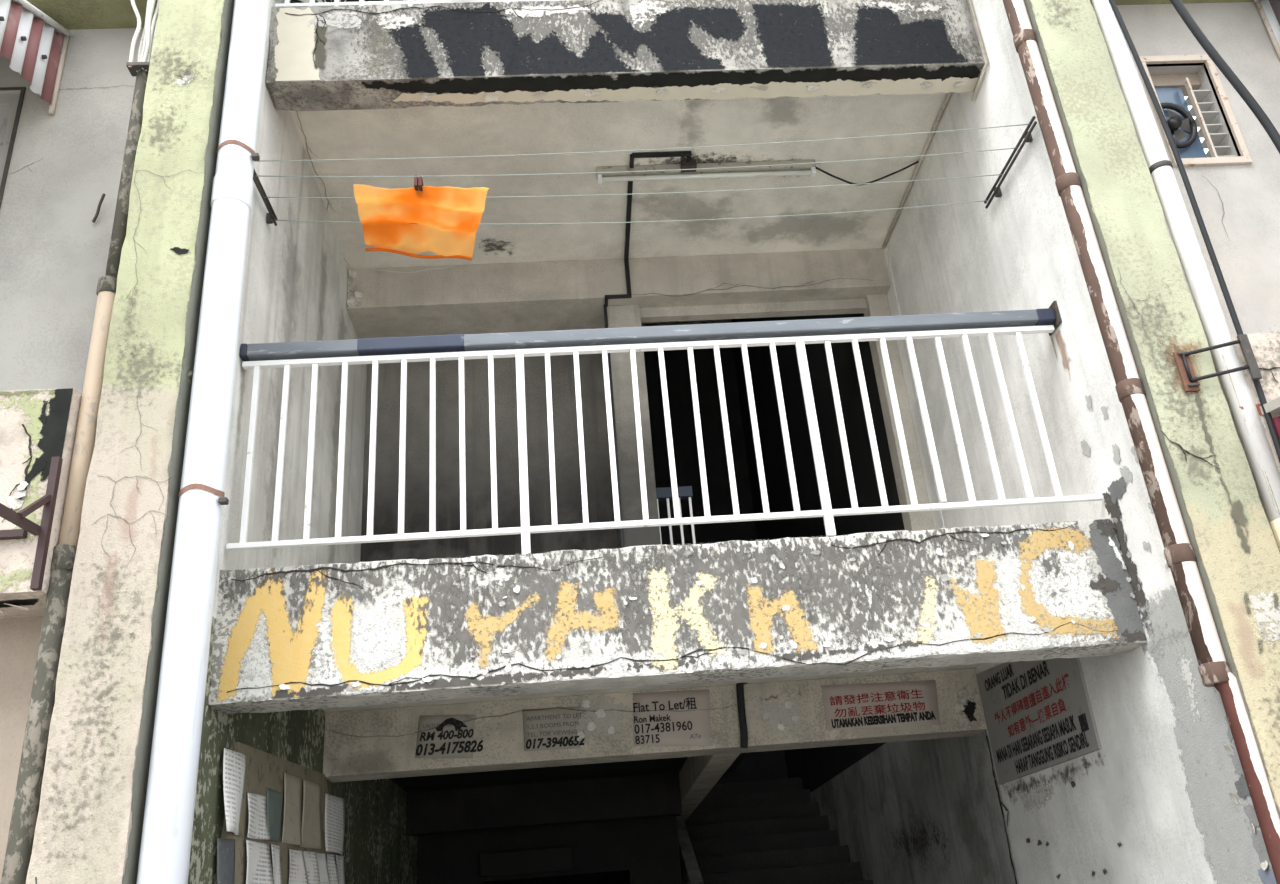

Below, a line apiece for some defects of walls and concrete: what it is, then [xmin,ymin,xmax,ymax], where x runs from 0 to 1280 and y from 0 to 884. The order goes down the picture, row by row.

peeling [308,11,415,30]
peeling [505,4,590,18]
peeling [630,0,667,28]
peeling [865,1,942,14]
peeling [1085,395,1108,420]
damp [44,0,235,884]
spalling [1089,444,1189,660]
peeling [454,565,520,607]
spalling [0,599,38,613]
spalling [738,621,930,662]
spalling [388,648,698,691]
spalling [274,681,361,699]